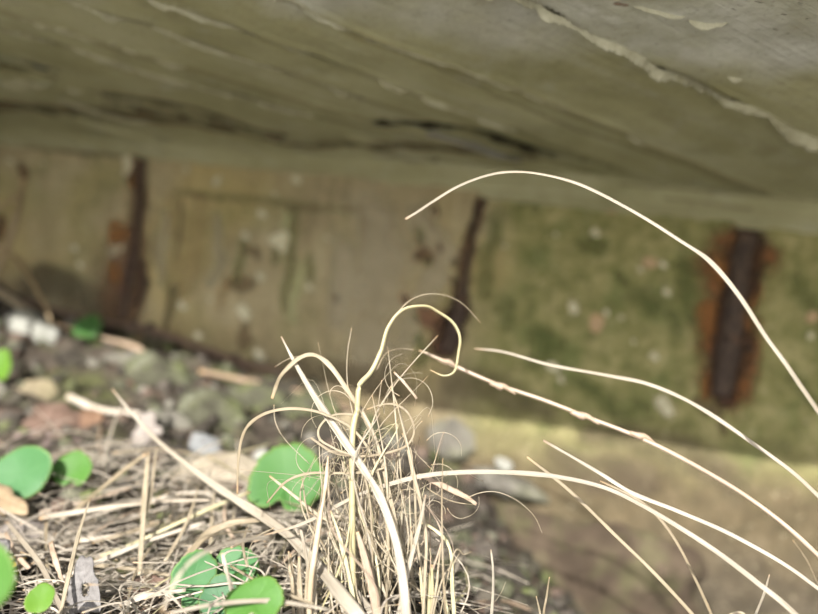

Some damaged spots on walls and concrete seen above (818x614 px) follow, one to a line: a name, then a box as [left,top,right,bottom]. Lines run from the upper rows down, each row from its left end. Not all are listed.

peeling [614,0,729,31]
crack [92,91,287,138]
crack [372,119,586,161]
rust [99,155,151,323]
rust [414,198,487,358]
rust [694,228,781,434]